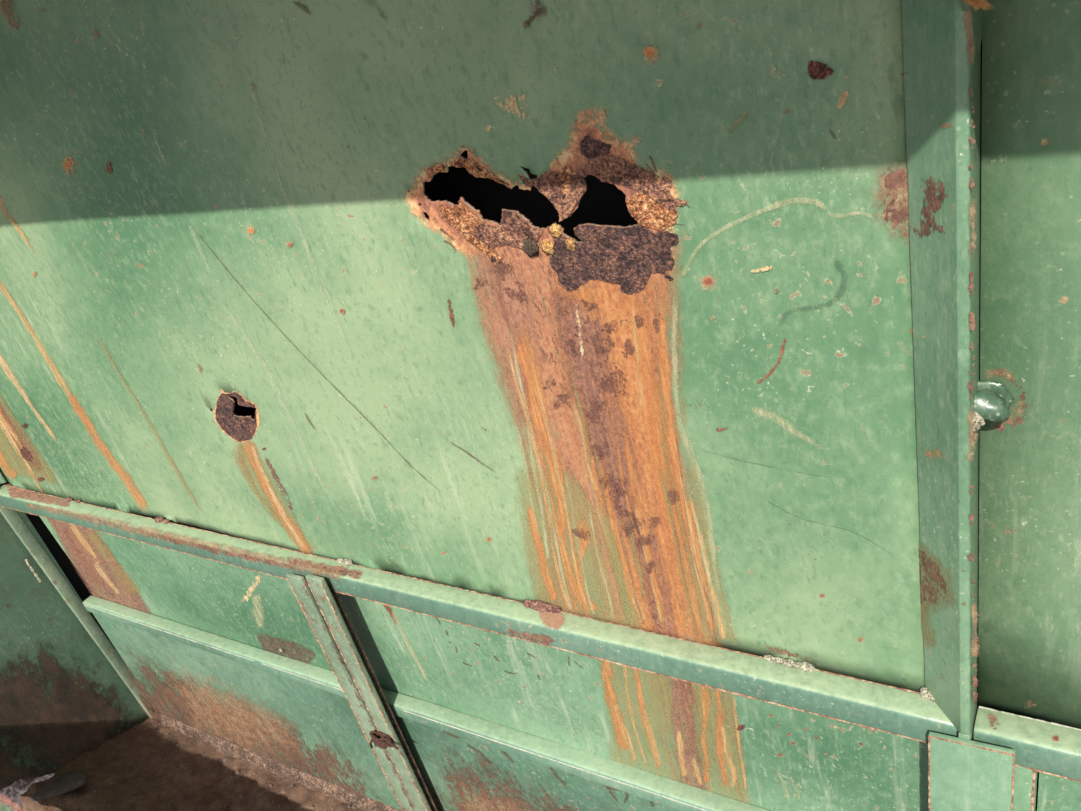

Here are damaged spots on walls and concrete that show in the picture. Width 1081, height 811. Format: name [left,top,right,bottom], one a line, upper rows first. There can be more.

corrosion [0,282,146,507]
corrosion [0,355,362,614]
corrosion [404,108,733,645]
corrosion [0,646,367,811]
corrosion [384,605,425,677]
corrosion [602,661,747,803]